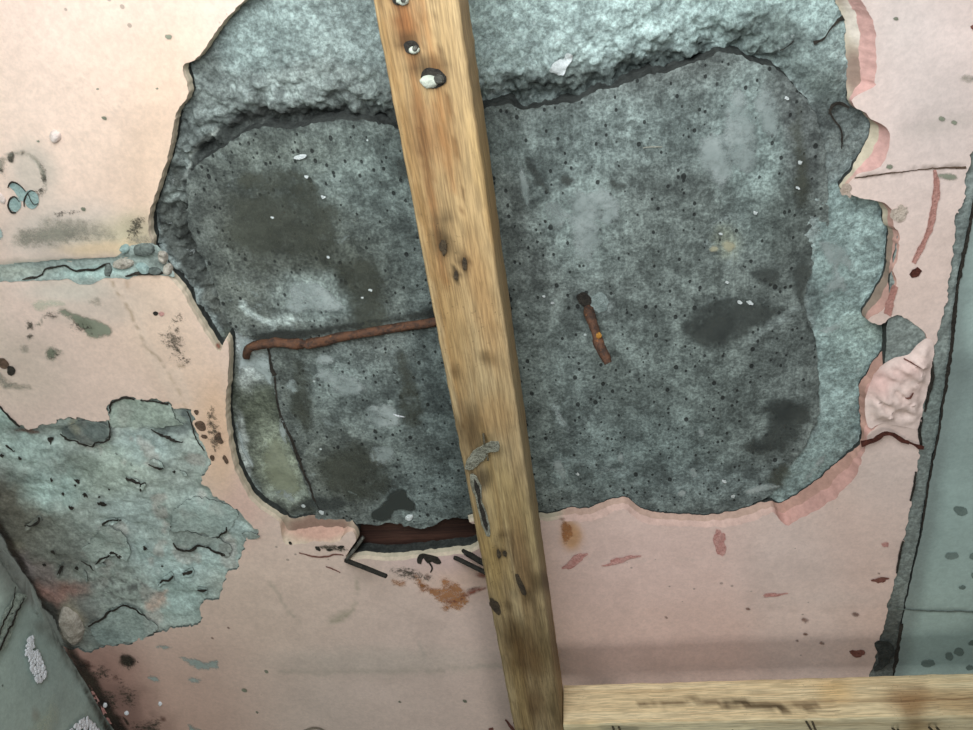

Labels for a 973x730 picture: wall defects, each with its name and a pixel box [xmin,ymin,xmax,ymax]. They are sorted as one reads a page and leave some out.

peeling [7,181,39,214]
flaking render [148,0,488,573]
water stain [287,261,384,329]
rust [242,317,436,360]
rust [576,292,612,365]
flaking render [468,0,908,556]
water stain [684,298,782,345]
crack [267,348,320,510]
peeling [0,396,260,651]
rust [392,569,485,611]
water stain [25,635,47,684]
water stain [66,643,160,730]